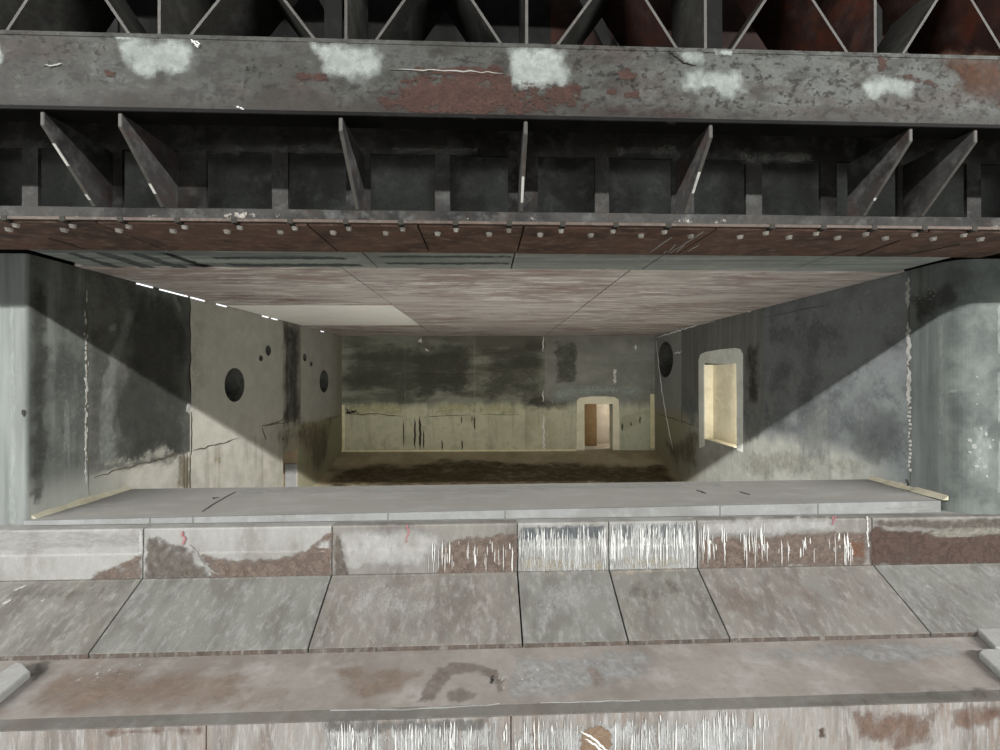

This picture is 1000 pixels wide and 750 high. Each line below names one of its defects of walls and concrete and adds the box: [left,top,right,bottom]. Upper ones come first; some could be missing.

corrosion [378,64,590,115]
corrosion [947,59,1000,102]
crack [262,417,302,441]
crack [94,438,238,478]
damp [474,524,727,572]
corrosion [854,713,935,750]
corrosion [956,709,999,728]